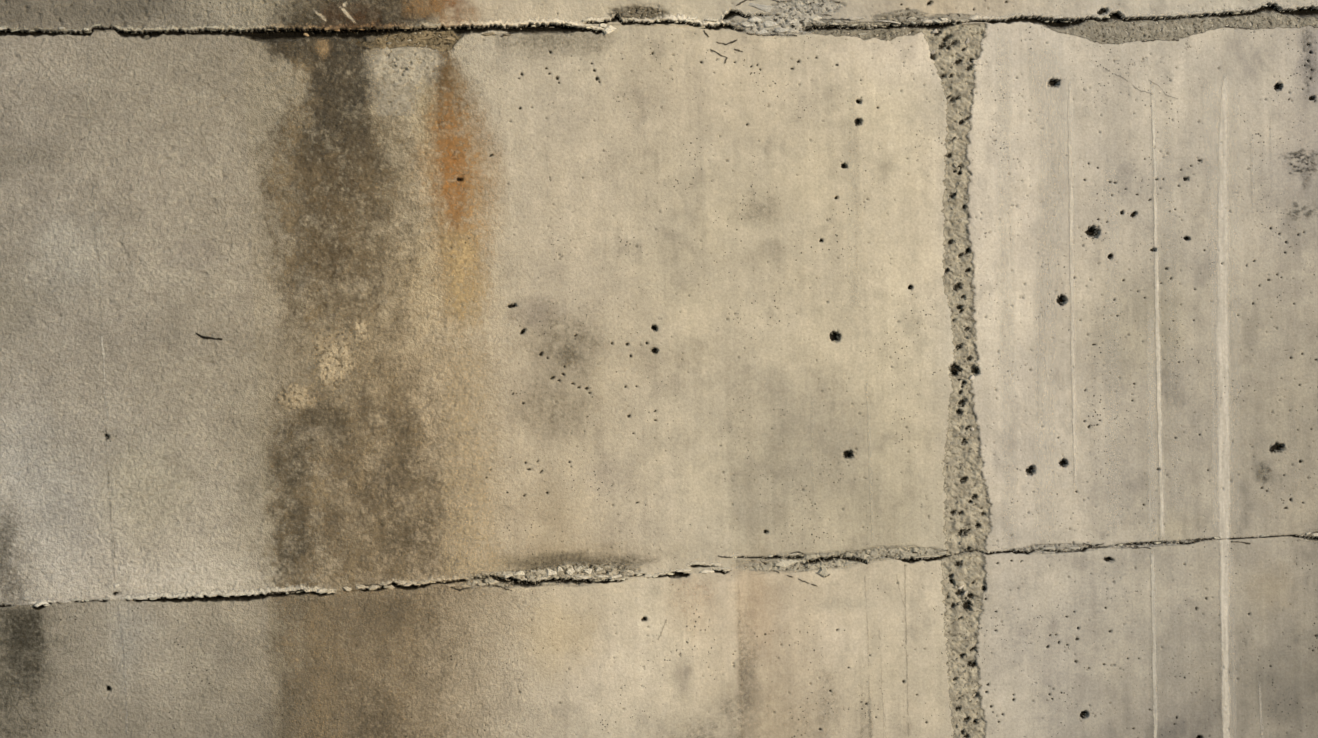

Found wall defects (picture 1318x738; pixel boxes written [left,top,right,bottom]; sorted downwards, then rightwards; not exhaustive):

leakage [261,0,416,338]
corrosion [428,43,483,313]
crack [0,0,1318,76]
spalling [733,0,1190,738]
leakage [266,359,459,738]
crack [0,532,1318,610]